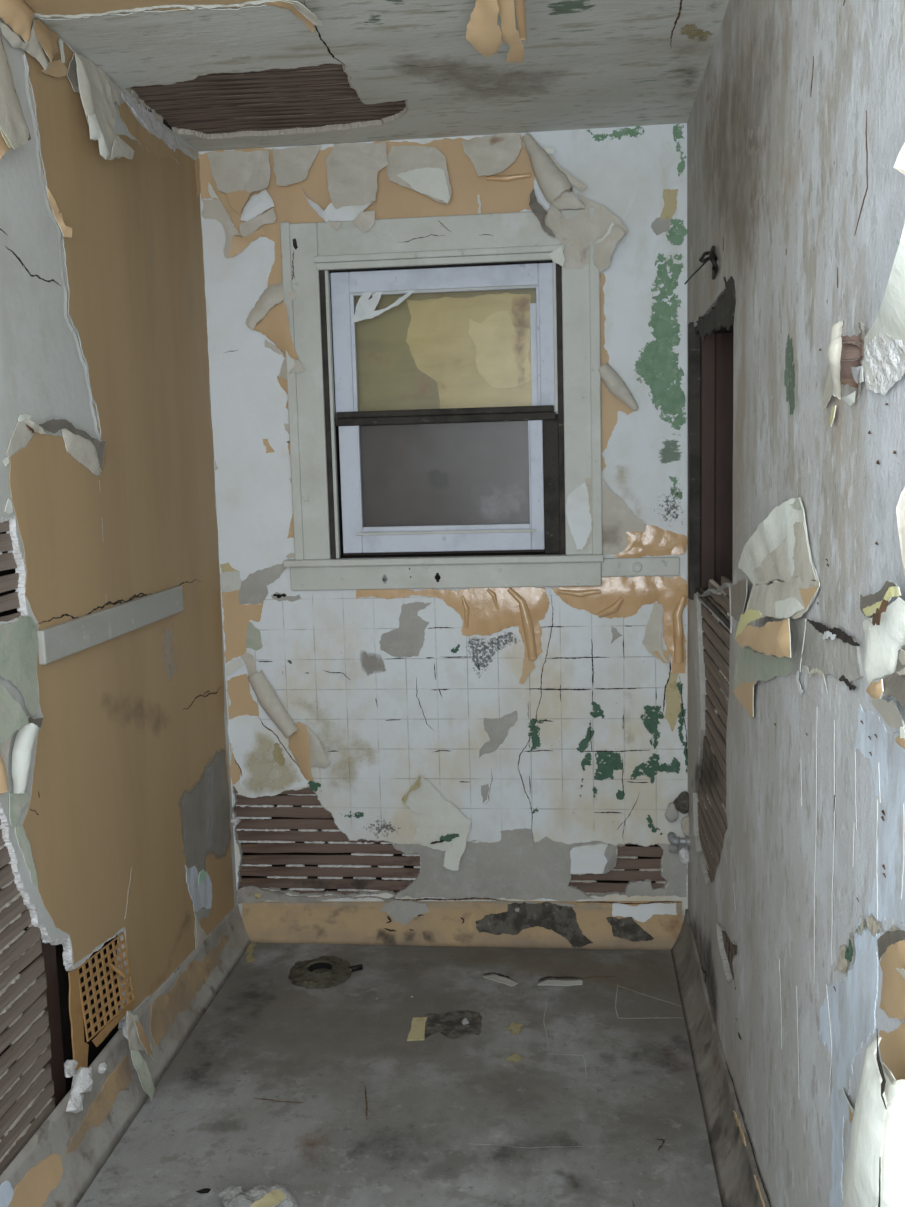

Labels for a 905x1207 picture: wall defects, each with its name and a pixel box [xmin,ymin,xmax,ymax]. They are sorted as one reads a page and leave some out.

crack [304,1,345,66]
crack [670,0,683,45]
peeling [893,142,905,175]
crack [0,229,61,286]
peeling [819,221,905,427]
crack [37,593,151,625]
peeling [0,0,688,1207]
crack [375,627,461,752]
crack [460,590,688,850]
peeling [356,487,905,1207]